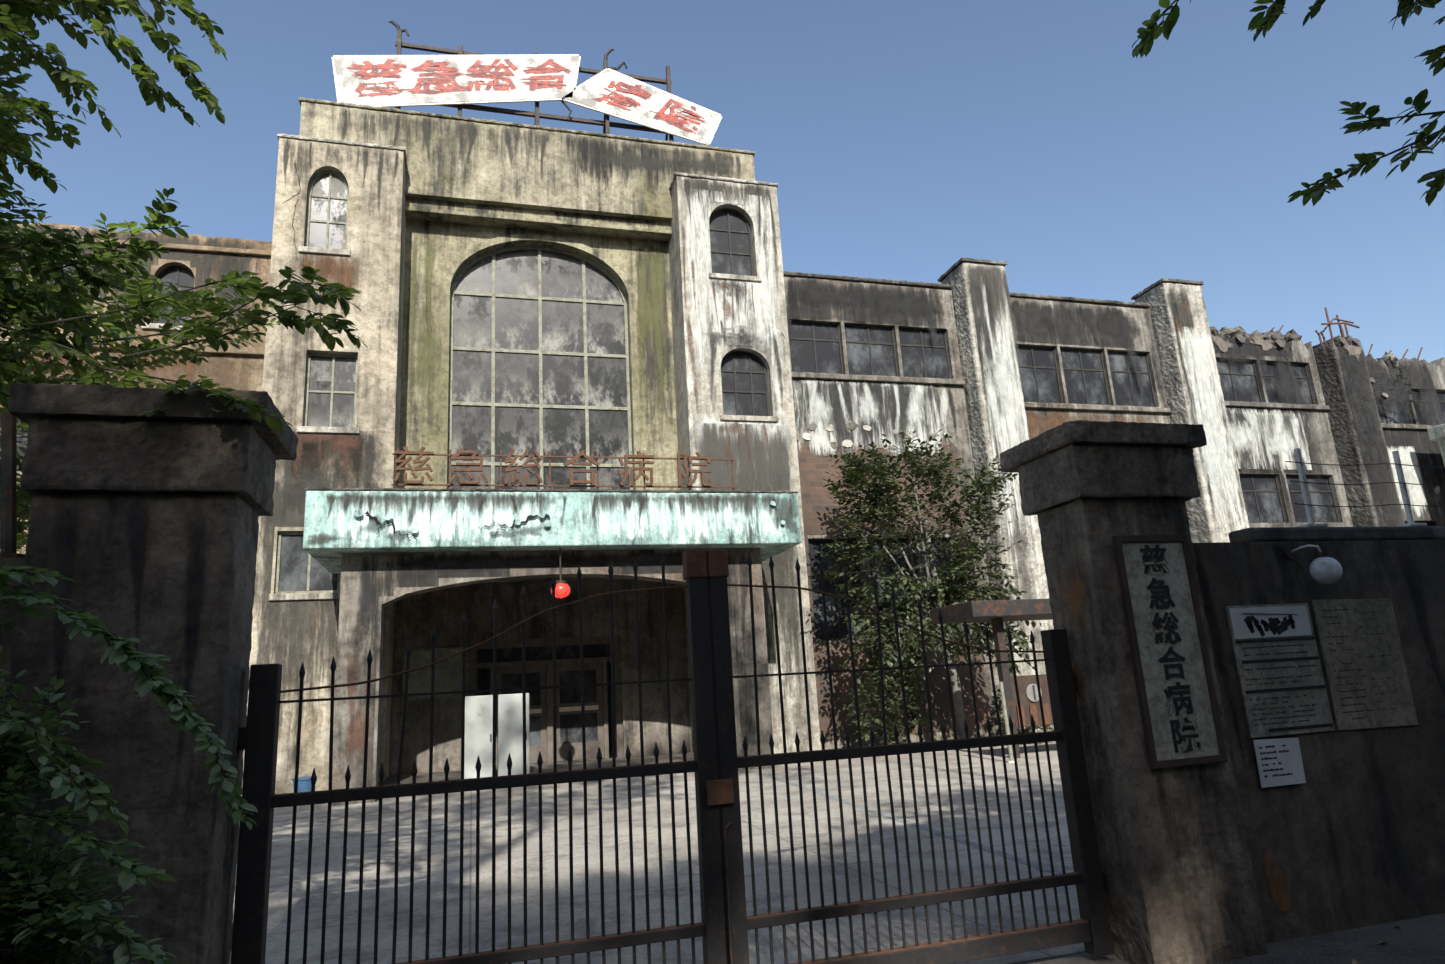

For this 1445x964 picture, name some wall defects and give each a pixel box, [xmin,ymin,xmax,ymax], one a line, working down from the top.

leakage [283,109,435,206]
leakage [456,123,548,171]
leakage [555,135,777,264]
leakage [406,240,434,363]
spalling [1209,307,1423,398]
leakage [1169,287,1314,529]
rust [295,433,362,483]
crack [365,511,416,539]
crack [478,514,550,536]
leakage [257,281,956,752]
leakage [358,666,376,784]